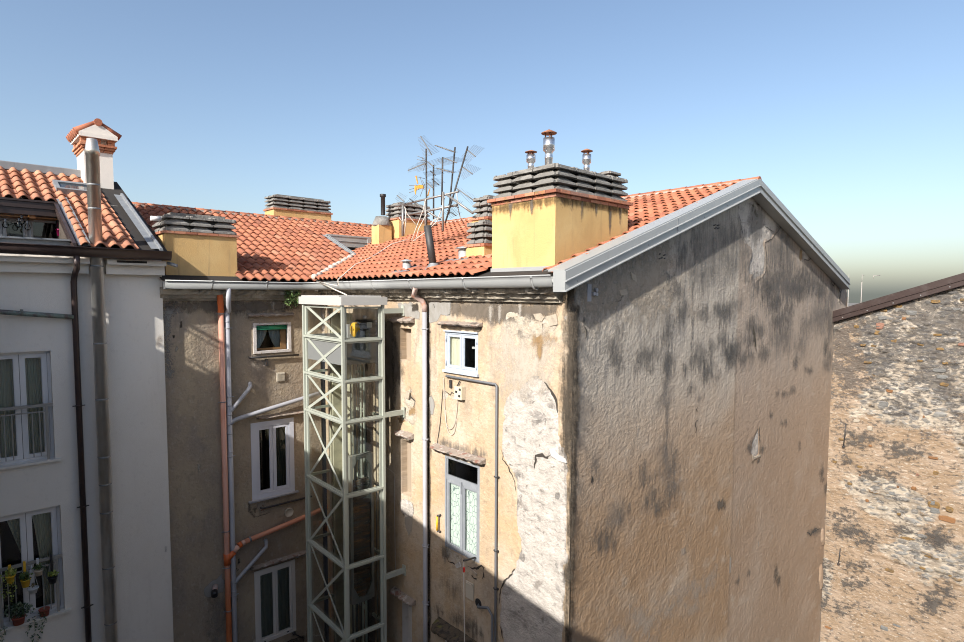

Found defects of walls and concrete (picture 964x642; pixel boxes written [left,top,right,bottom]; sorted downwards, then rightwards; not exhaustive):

water stain [685,318,767,381]
water stain [745,265,833,365]
peeling [751,428,760,463]
peeling [499,376,568,642]